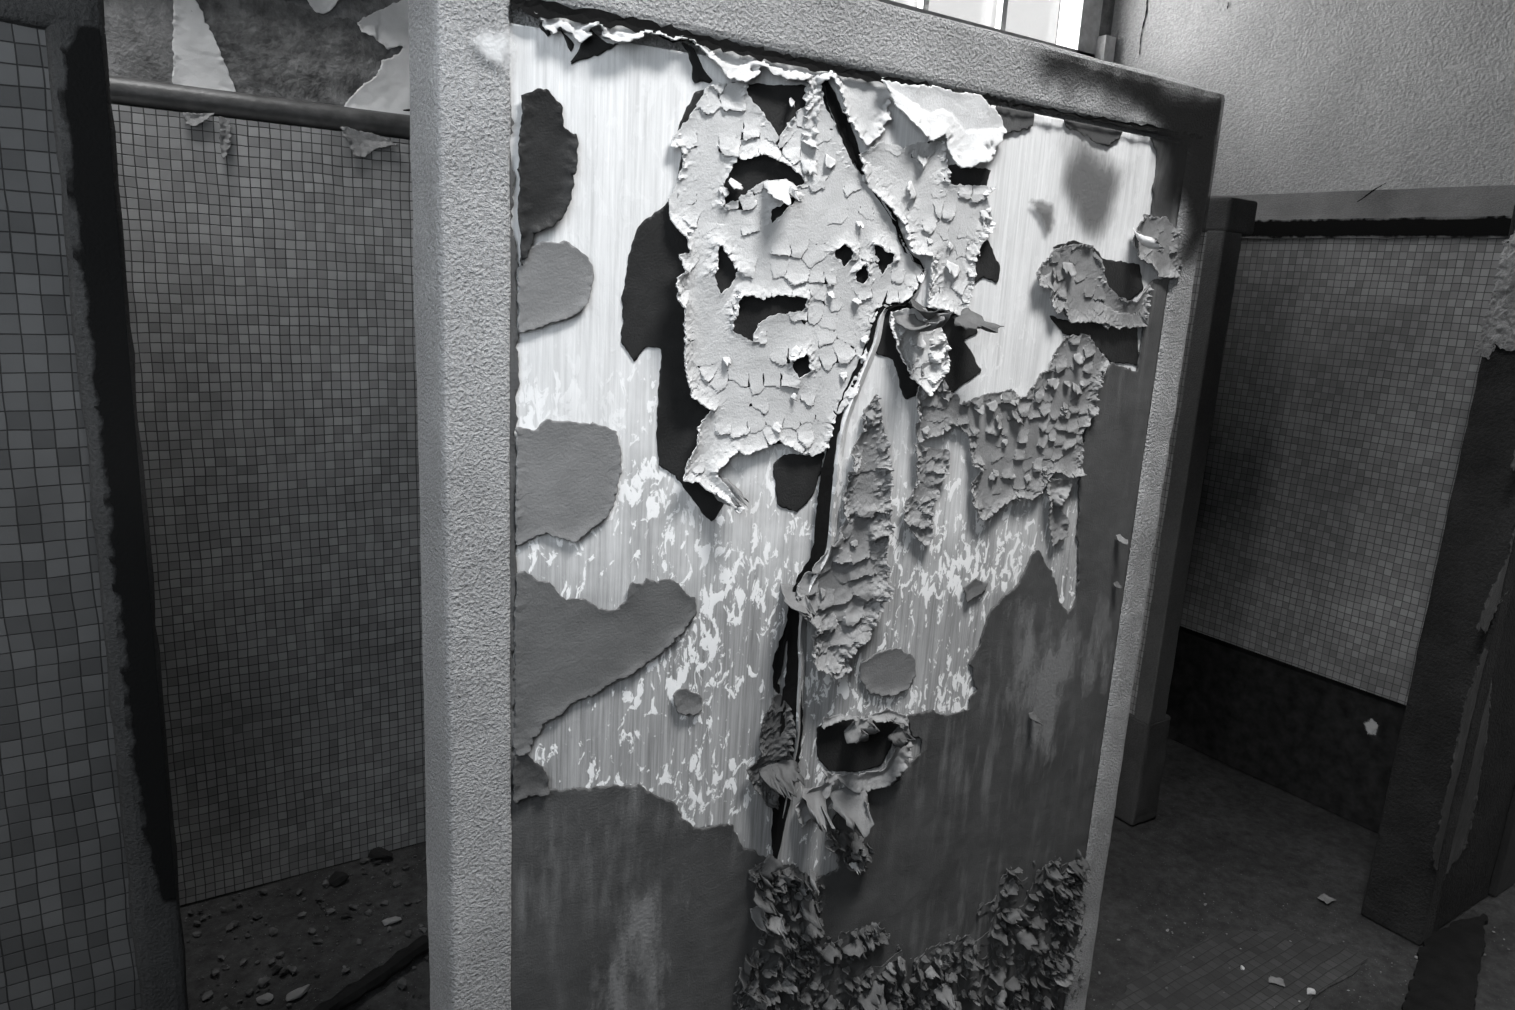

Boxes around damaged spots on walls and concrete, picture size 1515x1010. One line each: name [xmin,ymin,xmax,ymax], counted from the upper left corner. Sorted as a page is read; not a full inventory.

spalling [172,0,410,115]
spalling [1475,231,1515,360]
peeling [510,13,1183,1010]